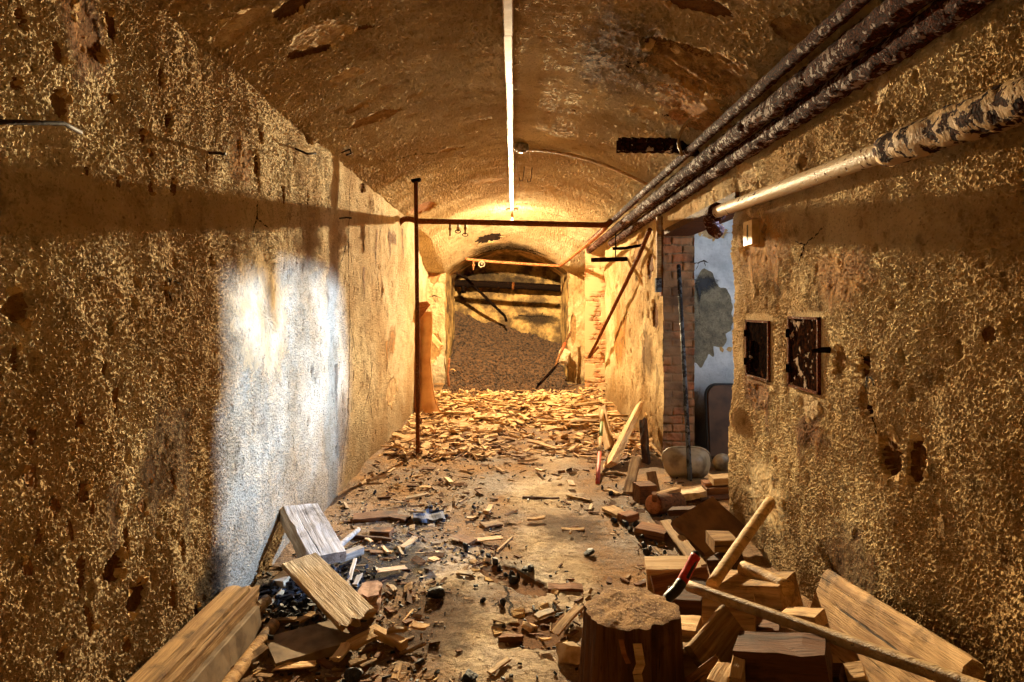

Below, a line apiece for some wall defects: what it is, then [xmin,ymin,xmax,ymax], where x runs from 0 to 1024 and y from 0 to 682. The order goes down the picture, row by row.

crack [795,226,824,265]
peeling [694,268,733,368]
crack [856,350,877,434]
spalling [875,424,929,486]